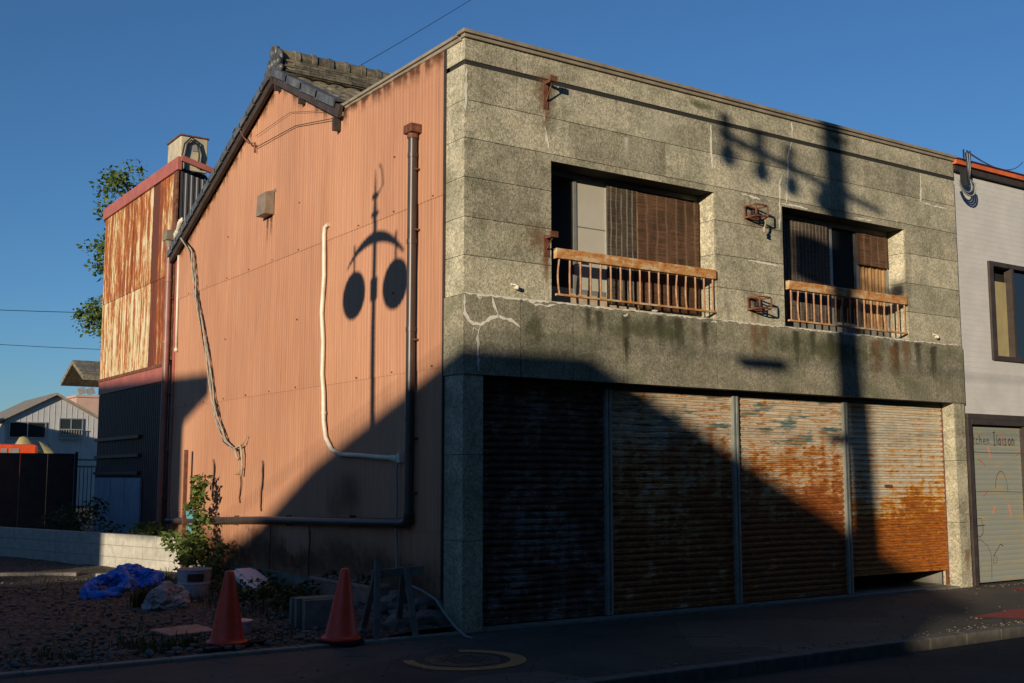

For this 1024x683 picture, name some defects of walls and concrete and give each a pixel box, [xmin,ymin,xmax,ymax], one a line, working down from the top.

crack [463,294,520,372]
water stain [618,314,682,348]